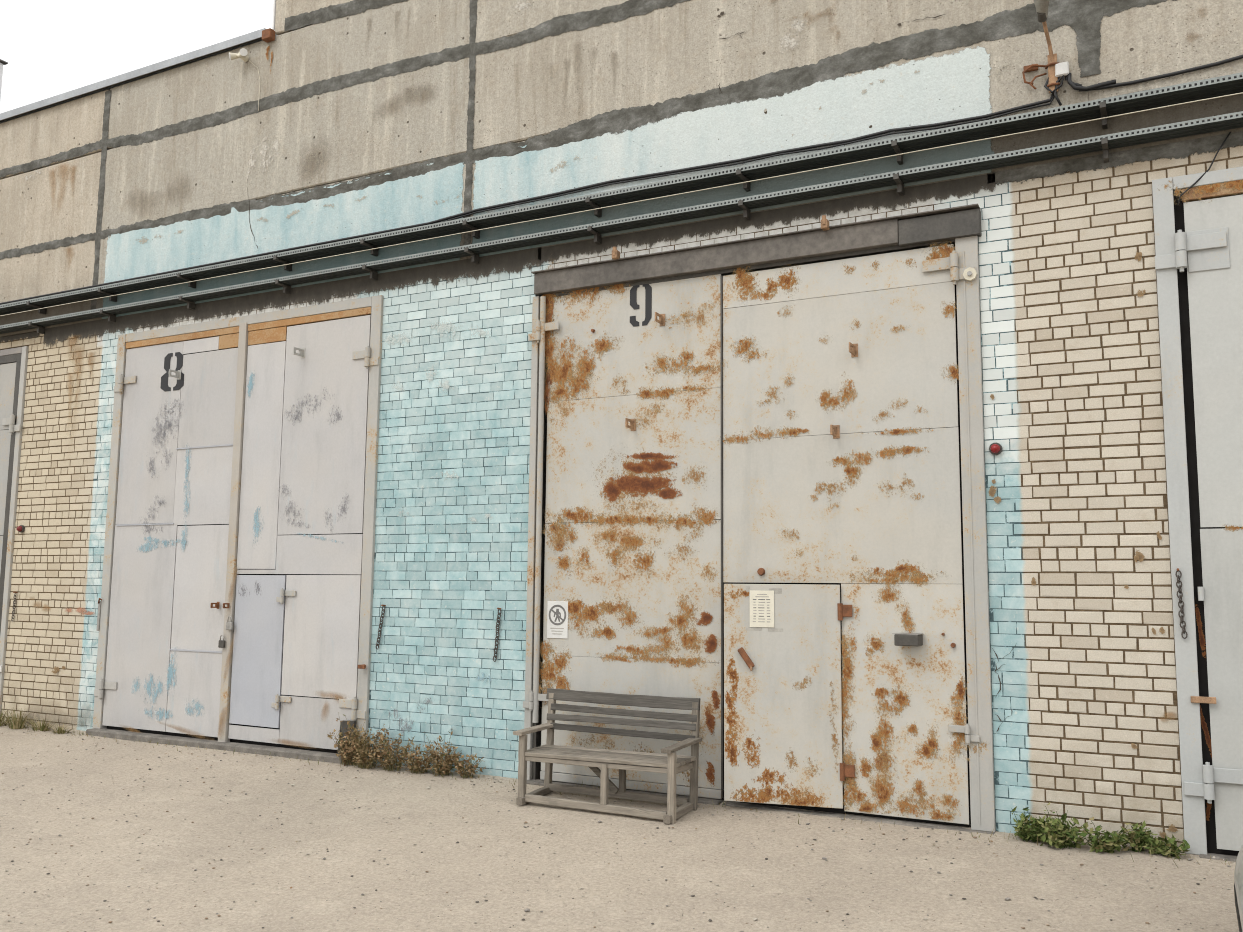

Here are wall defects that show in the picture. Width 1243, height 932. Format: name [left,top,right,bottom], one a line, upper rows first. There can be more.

rust [732,264,799,318]
peeling [139,449,190,552]
peeling [147,400,184,476]
peeling [279,485,349,542]
rust [543,283,631,428]
rust [542,448,718,578]
rust [612,337,767,427]
rust [723,410,809,444]
rust [810,399,933,508]
peeling [132,654,203,720]
rust [564,595,823,806]
rust [829,558,987,821]